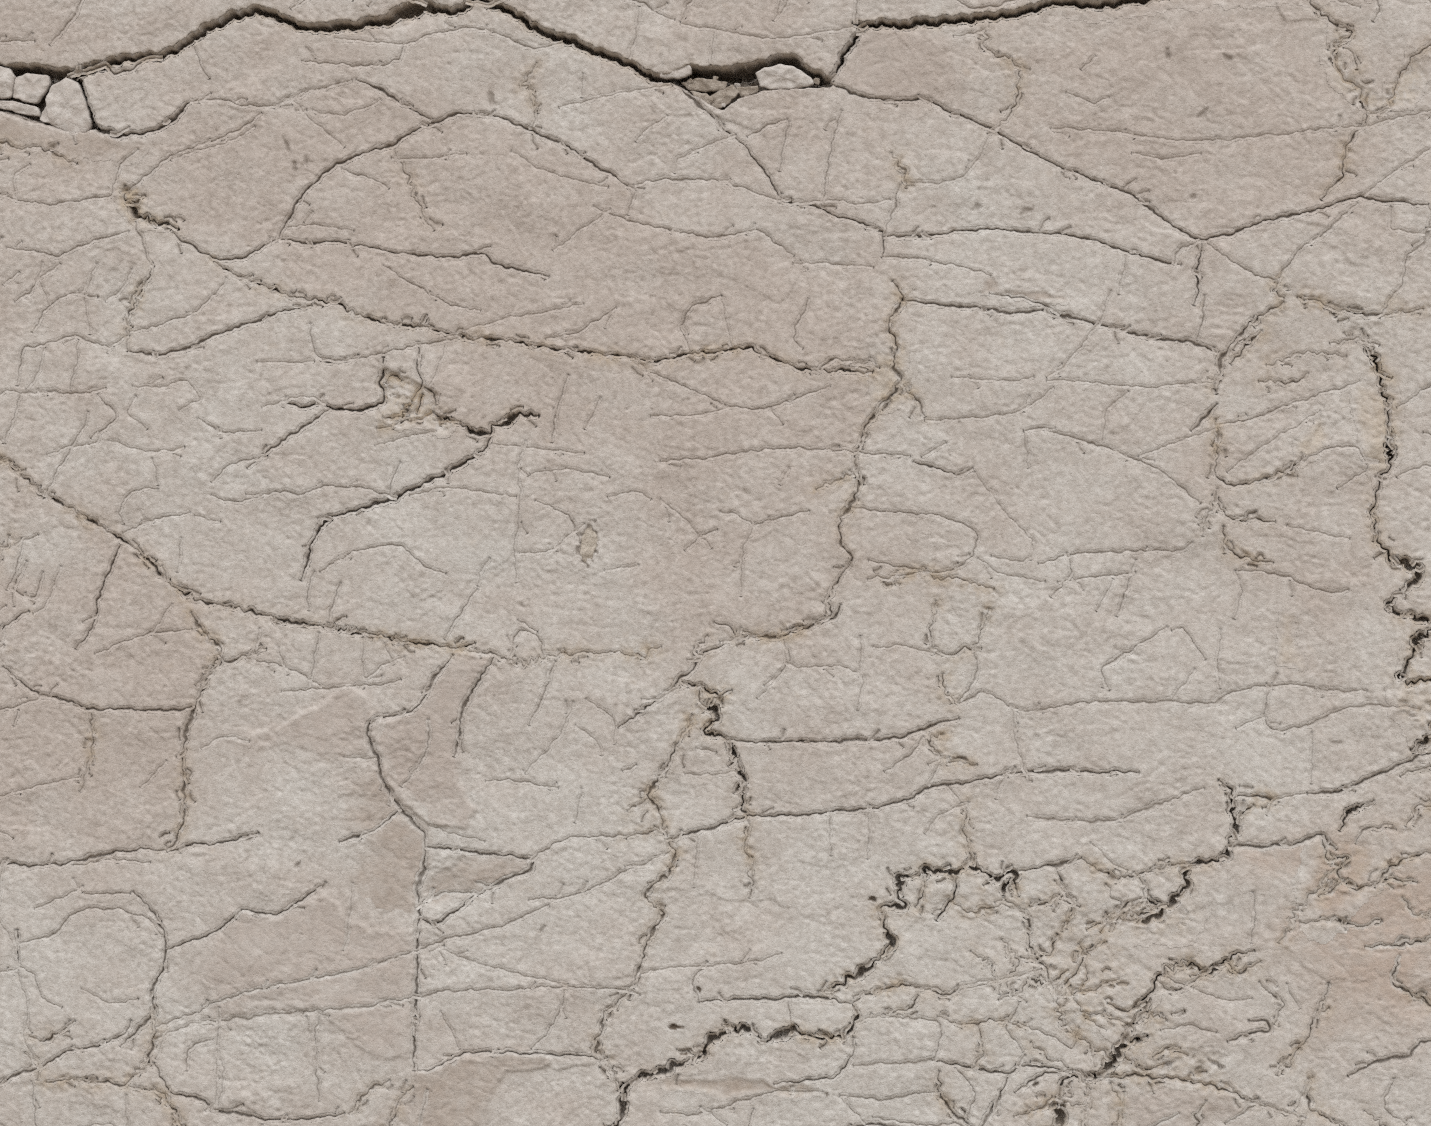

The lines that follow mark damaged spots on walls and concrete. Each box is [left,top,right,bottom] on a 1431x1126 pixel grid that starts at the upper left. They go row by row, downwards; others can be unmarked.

crack [1051,0,1431,201]
crack [211,403,609,583]
crack [1022,379,1379,505]
crack [1267,329,1431,689]
crack [0,602,405,904]
crack [1308,722,1431,797]
crack [46,1005,185,1126]
crack [12,878,327,1016]
crack [142,1007,345,1126]
crack [819,802,1022,999]
crack [839,939,1347,1126]
crack [1018,779,1431,944]